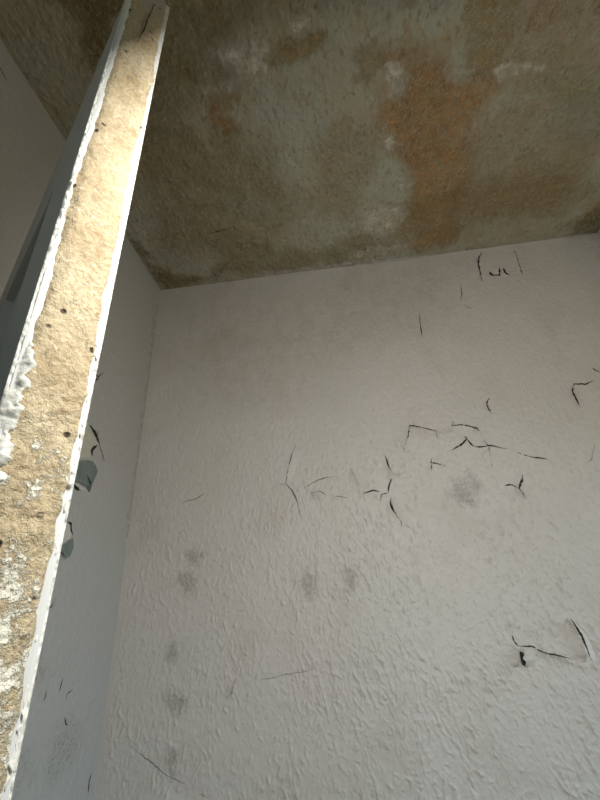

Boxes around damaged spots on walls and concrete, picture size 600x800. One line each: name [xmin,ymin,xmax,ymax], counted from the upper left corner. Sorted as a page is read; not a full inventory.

water stain [63,0,124,65]
water stain [151,0,228,109]
peeling [468,251,522,281]
spalling [74,418,100,494]
spalling [61,522,74,558]
peeling [502,619,596,670]